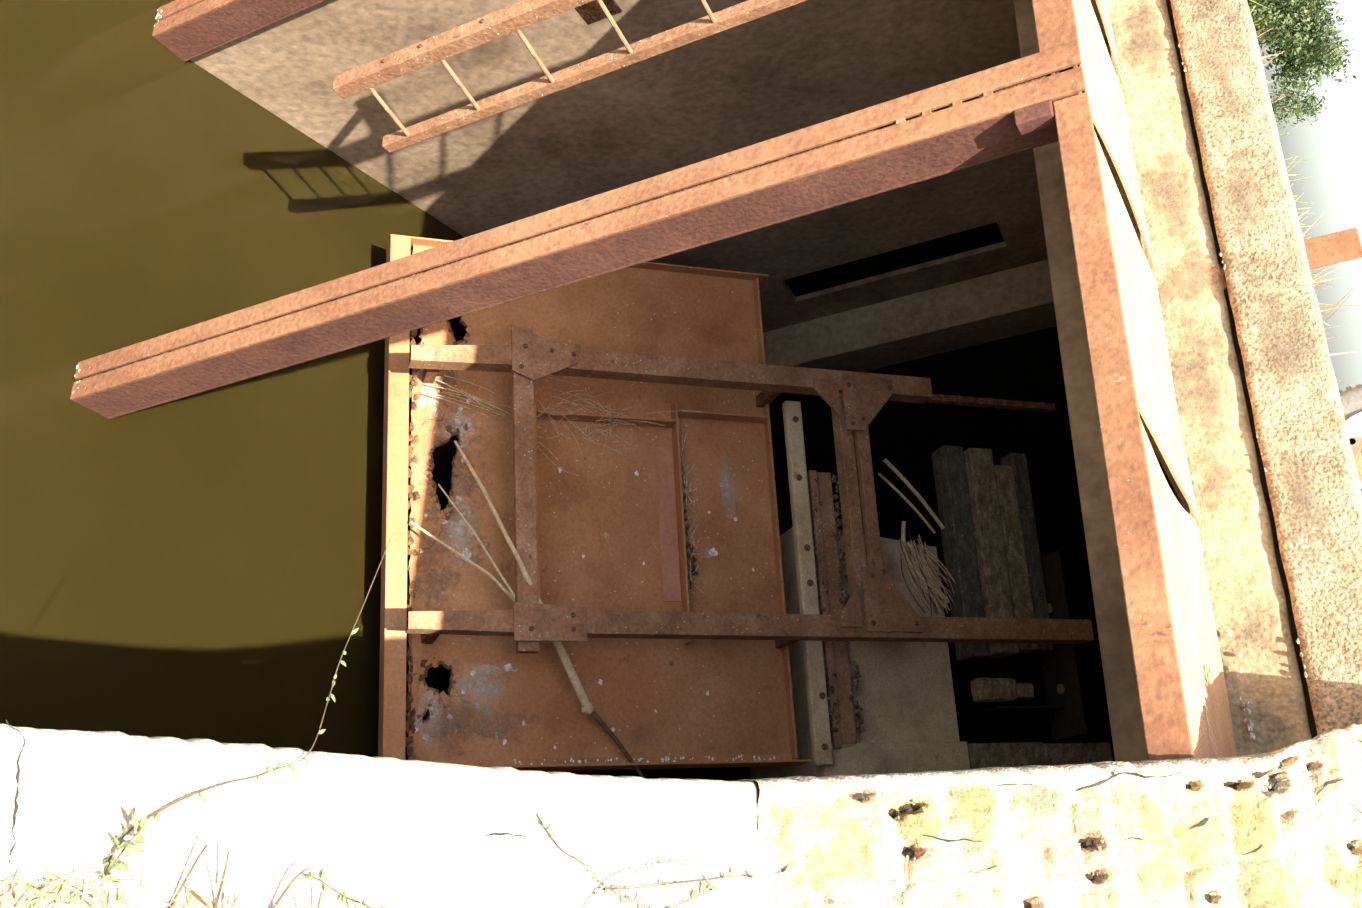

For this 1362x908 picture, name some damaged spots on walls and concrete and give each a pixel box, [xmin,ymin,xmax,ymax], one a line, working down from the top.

corrosion [416,450,483,610]
corrosion [682,475,699,590]
corrosion [410,636,471,755]
crack [6,720,26,863]
crack [482,830,536,838]
crack [1076,770,1182,791]
crack [1316,779,1362,822]